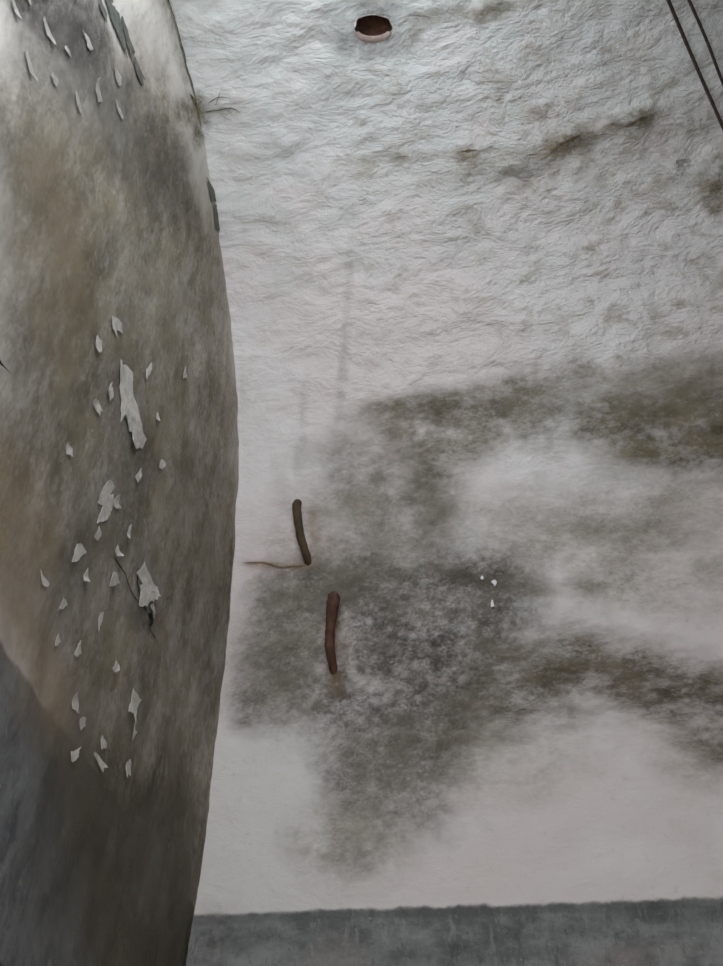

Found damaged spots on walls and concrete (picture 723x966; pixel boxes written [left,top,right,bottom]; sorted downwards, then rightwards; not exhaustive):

peeling [112,315,123,337]
peeling [93,360,147,449]
leakage [575,368,723,468]
peeling [94,480,121,541]
leakage [0,0,236,966]
leakage [337,382,560,534]
peeling [72,543,86,562]
peeling [137,562,161,626]
peeling [72,692,87,730]
peeling [128,688,142,740]
leakage [244,552,723,855]
peeling [94,736,108,772]